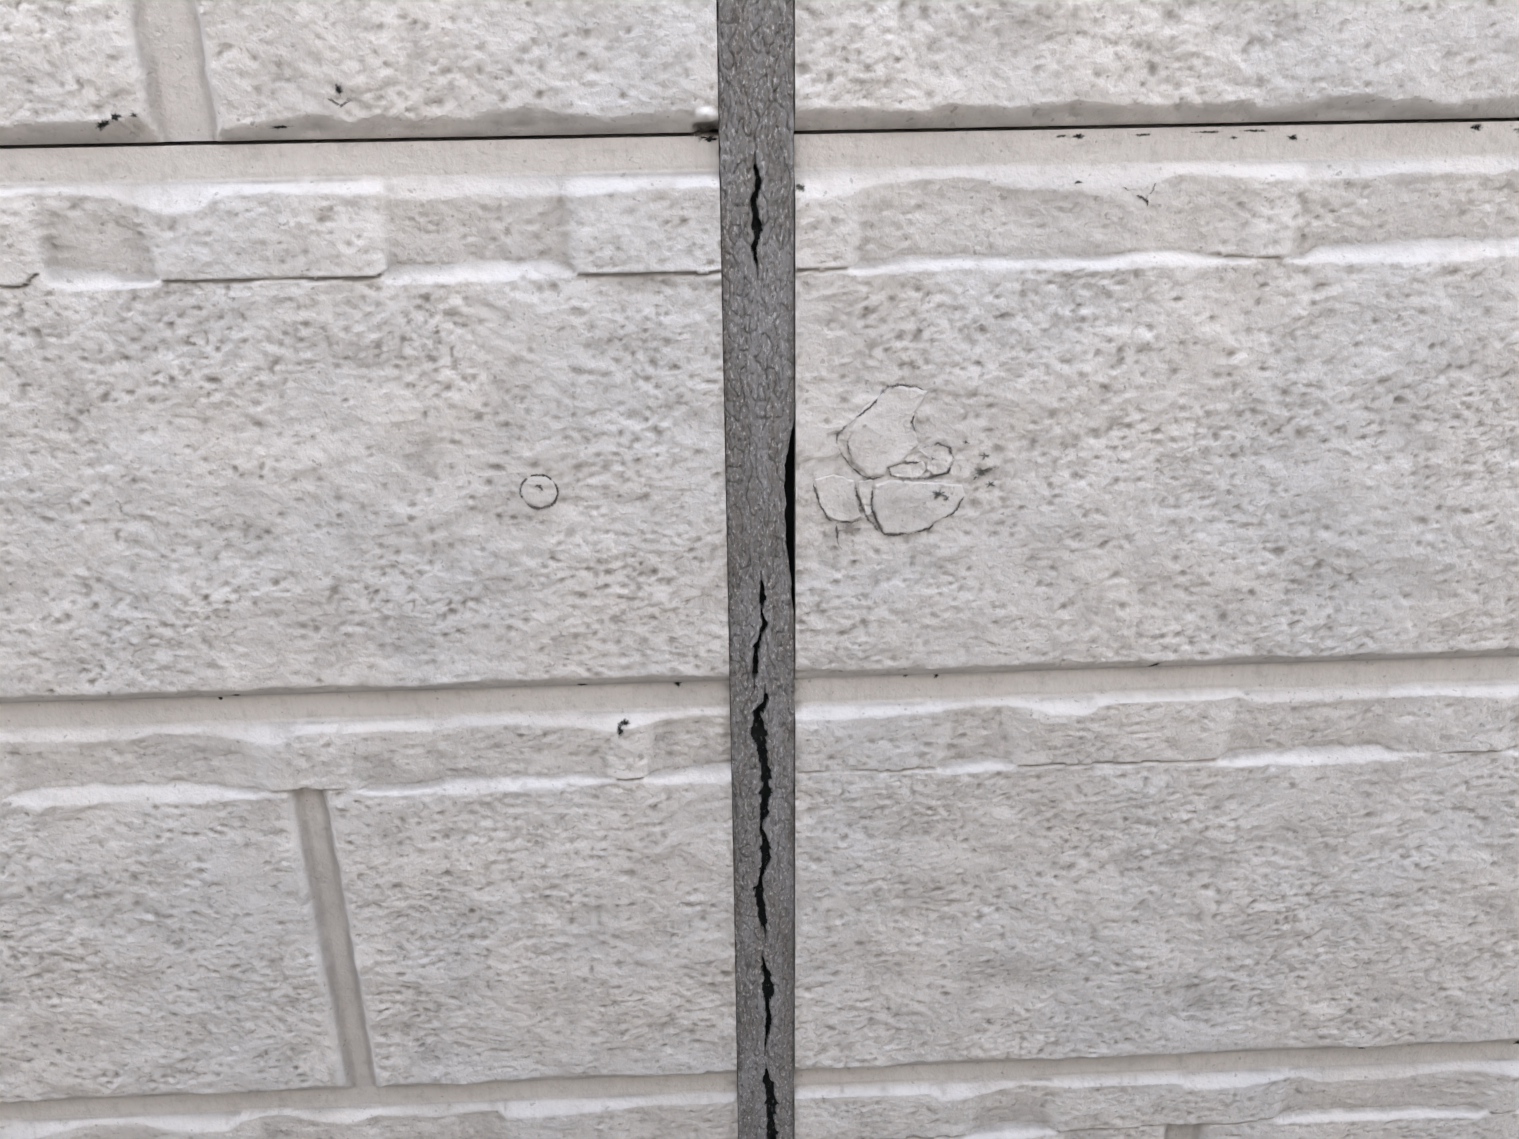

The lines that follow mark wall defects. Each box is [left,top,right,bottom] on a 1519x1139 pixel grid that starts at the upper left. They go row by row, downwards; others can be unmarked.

crack [750,164,763,262]
peeling [813,383,995,544]
crack [751,580,779,1139]